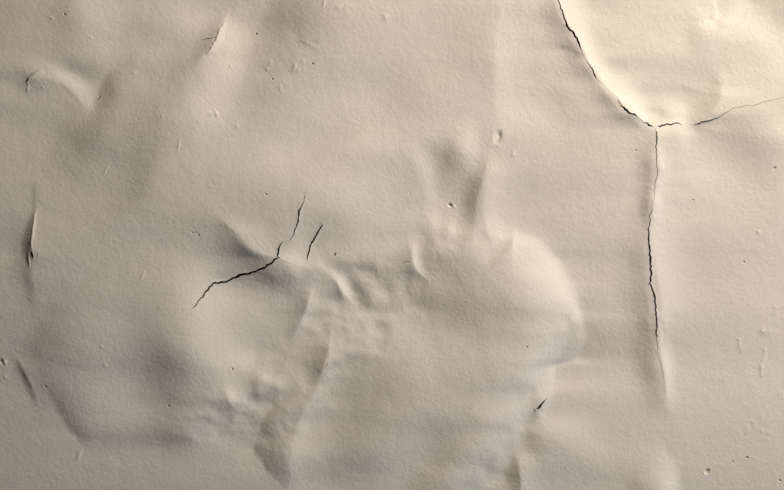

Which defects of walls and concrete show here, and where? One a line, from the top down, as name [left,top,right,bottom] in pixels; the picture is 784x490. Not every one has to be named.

crack [188,188,326,313]
crack [554,0,784,398]